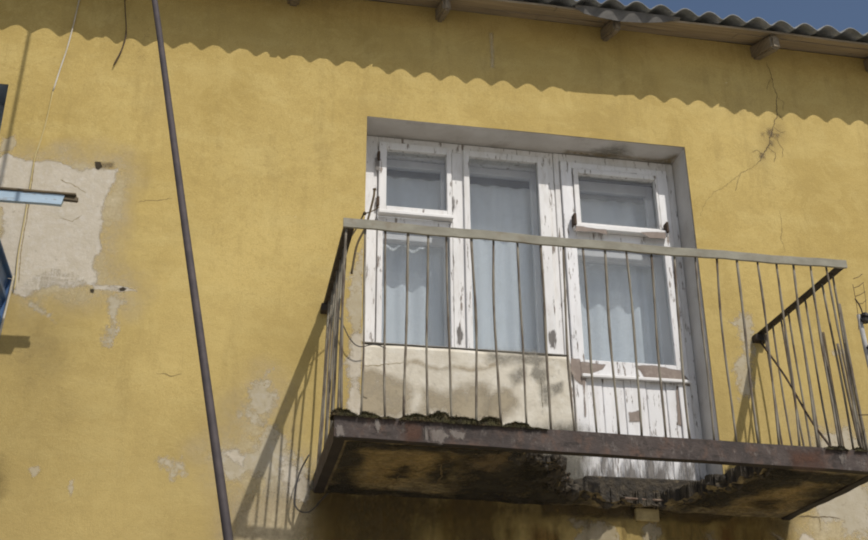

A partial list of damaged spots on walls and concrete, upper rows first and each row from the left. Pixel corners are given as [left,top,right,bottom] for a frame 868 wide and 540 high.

crack [702,62,786,210]
peeling [0,136,136,348]
water stain [363,371,411,416]
water stain [423,386,516,419]
water stain [493,352,562,401]
peeling [570,358,605,417]
peeling [638,365,690,426]
peeling [221,368,314,511]
peeling [821,427,862,462]
spalling [471,453,773,510]
peeling [569,518,619,540]
peeling [797,482,868,540]